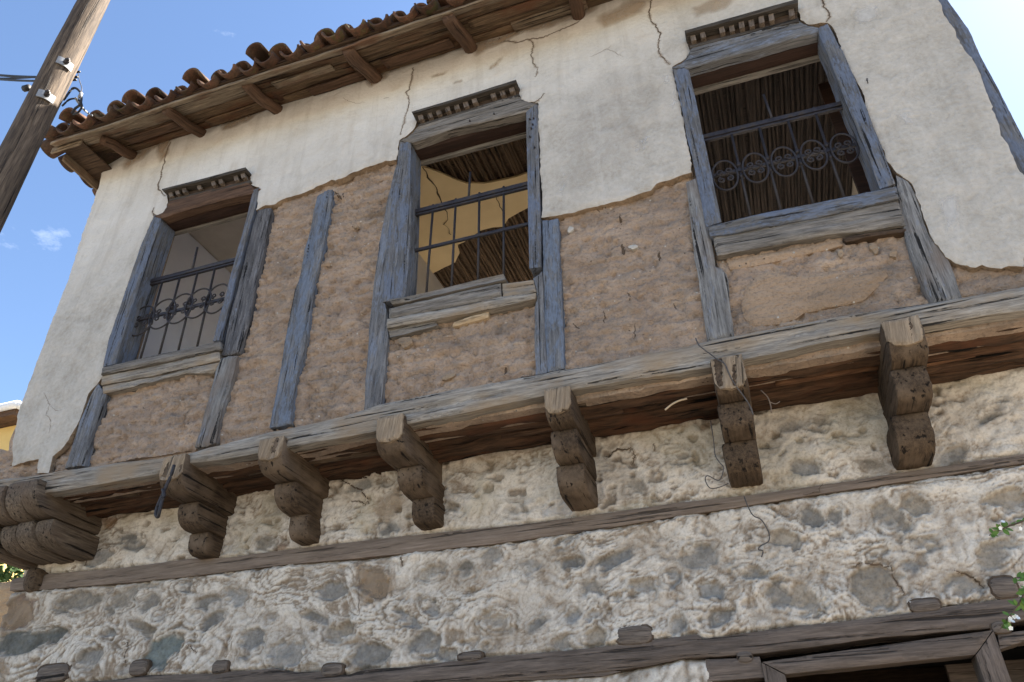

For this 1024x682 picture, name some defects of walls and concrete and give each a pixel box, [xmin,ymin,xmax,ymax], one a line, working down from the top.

crack [499,22,578,103]
crack [648,0,669,64]
crack [152,142,171,216]
flaking render [220,164,397,445]
flaking render [559,171,707,370]
flaking render [716,237,929,336]
flaking render [951,266,1024,298]
flaking render [385,306,536,403]
flaking render [90,375,214,467]